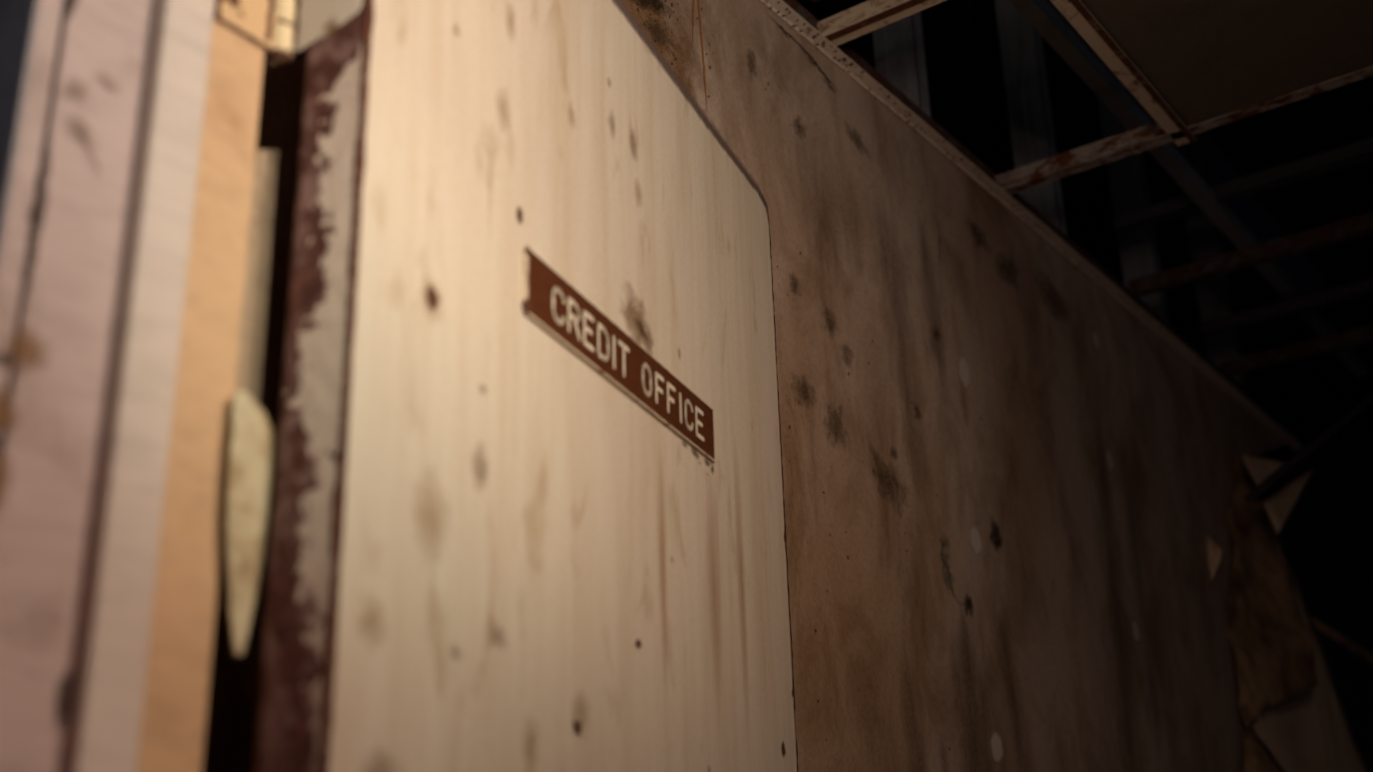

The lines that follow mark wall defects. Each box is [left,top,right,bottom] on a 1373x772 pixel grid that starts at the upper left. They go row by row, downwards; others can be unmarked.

corrosion [214,0,364,772]